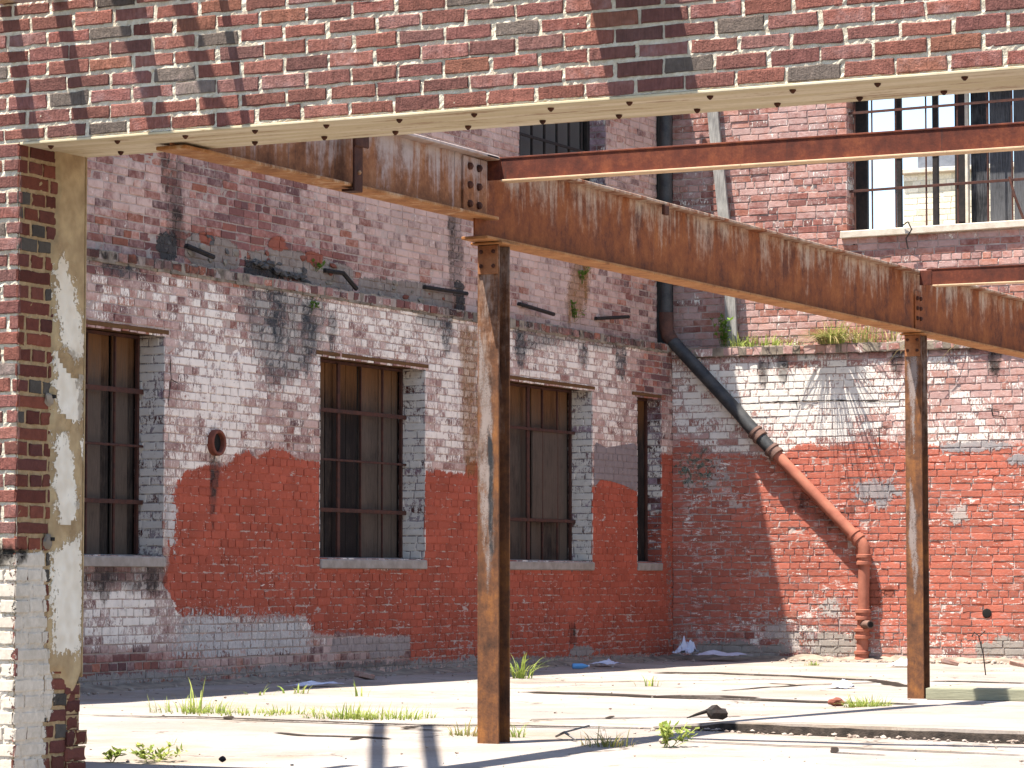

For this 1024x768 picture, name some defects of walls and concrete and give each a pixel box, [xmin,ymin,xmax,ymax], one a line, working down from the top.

peeling [908,356,918,434]
flaking render [0,152,87,768]
peeling [163,486,180,558]
peeling [850,473,918,593]
peeling [167,599,319,659]
peeling [330,634,411,659]